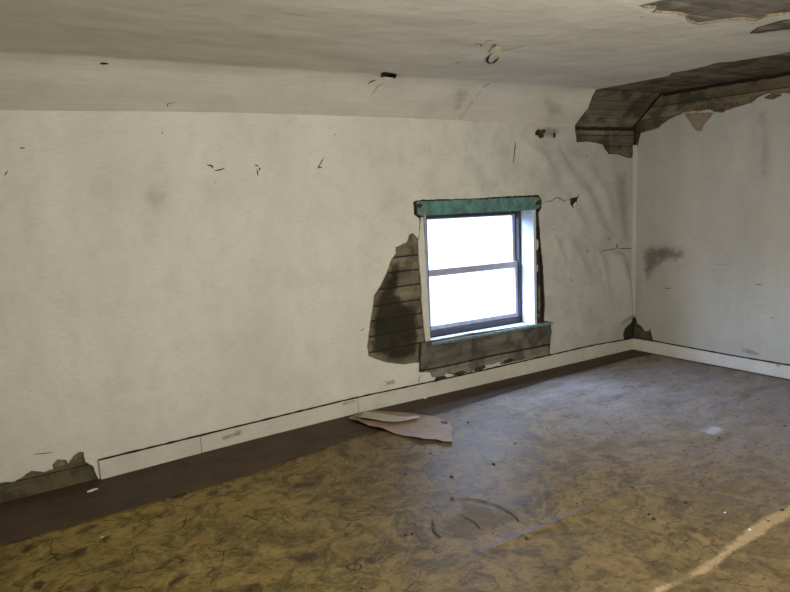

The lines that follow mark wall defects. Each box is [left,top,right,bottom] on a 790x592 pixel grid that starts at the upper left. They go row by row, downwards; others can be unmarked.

peeling [639,0,790,34]
crack [544,195,579,208]
peeling [367,203,426,364]
spalling [623,317,653,340]